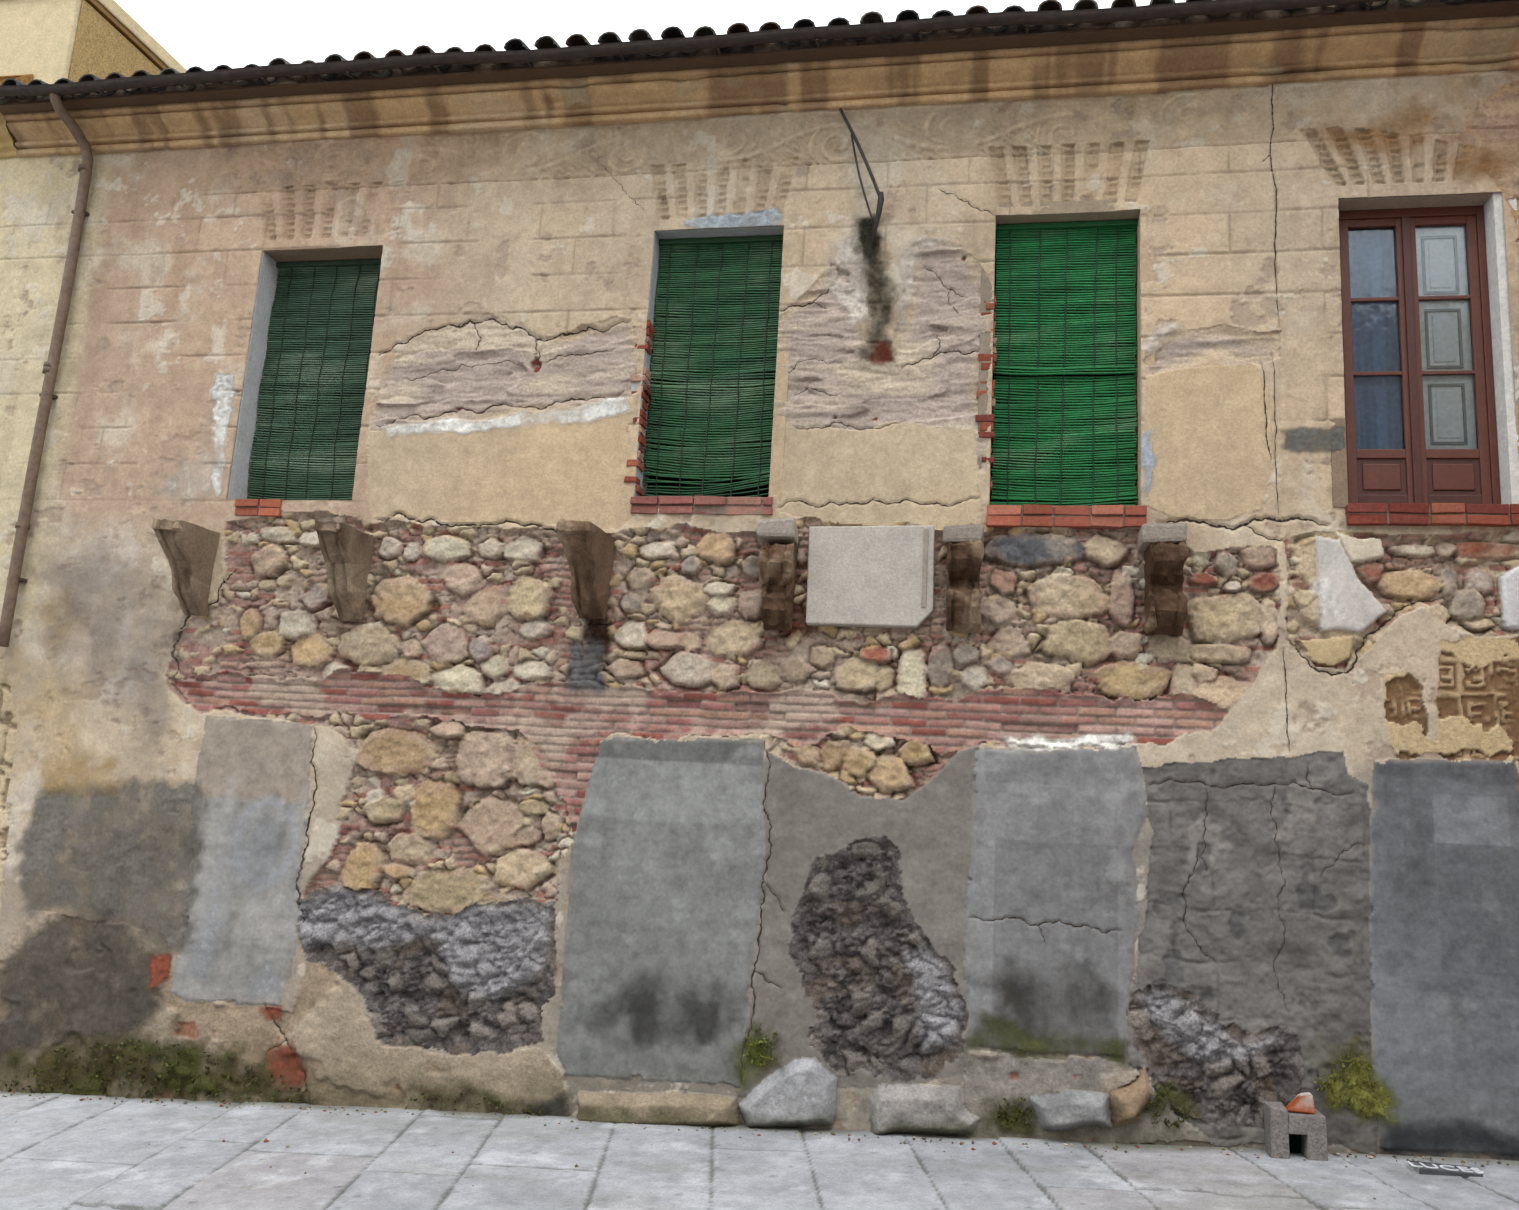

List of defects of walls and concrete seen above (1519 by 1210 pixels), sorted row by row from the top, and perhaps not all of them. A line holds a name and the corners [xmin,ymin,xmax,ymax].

peeling [0,74,34,85]
peeling [1465,80,1519,259]
leakage [829,216,942,358]
leakage [1141,325,1177,351]
crack [1167,85,1328,541]
spalling [0,237,1519,1144]
crack [1150,596,1449,1006]
crack [969,917,1111,942]